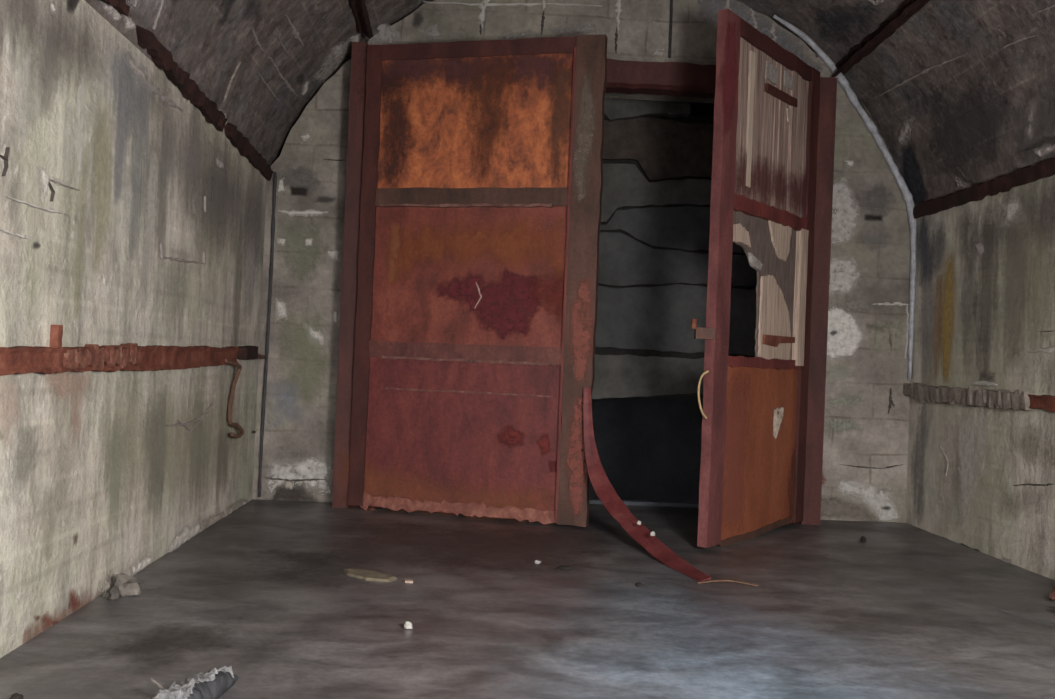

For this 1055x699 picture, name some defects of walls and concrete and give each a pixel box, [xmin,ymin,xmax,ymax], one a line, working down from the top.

leakage [1,0,91,74]
leakage [94,52,261,296]
corrosion [378,76,411,183]
corrosion [472,59,511,175]
corrosion [551,69,595,201]
peeling [831,183,887,241]
peeling [827,259,909,359]
leakage [917,216,945,351]
leakage [962,186,1055,374]
spalling [265,459,331,501]
leakage [913,409,925,514]